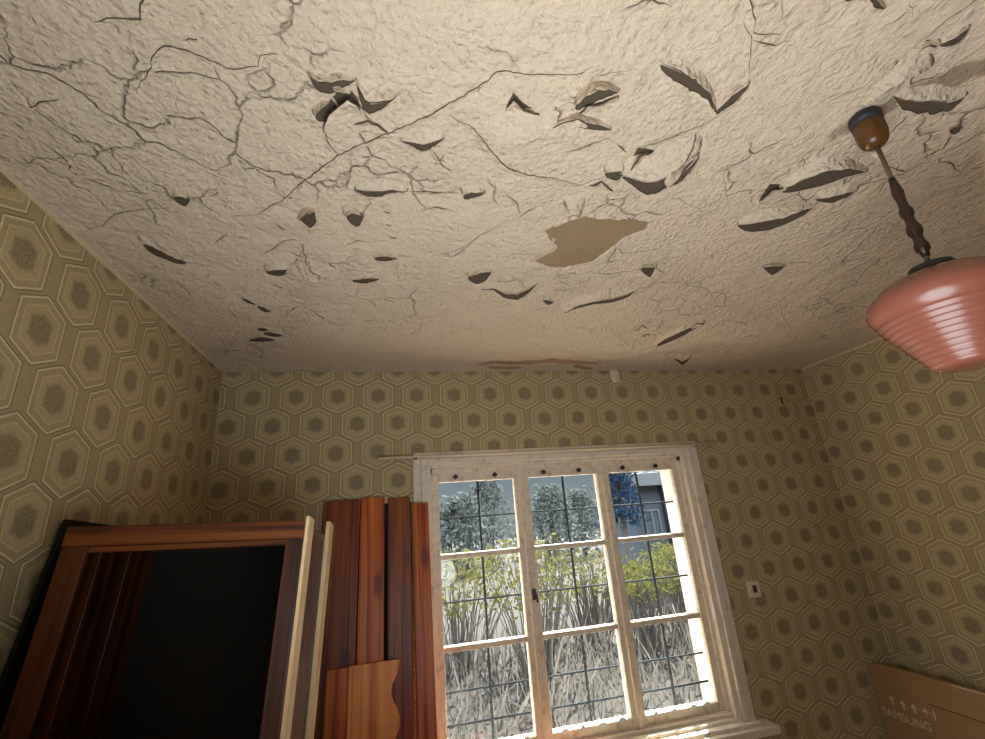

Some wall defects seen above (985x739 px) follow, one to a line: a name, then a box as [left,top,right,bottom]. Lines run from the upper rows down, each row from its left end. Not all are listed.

crack [94,0,153,26]
crack [136,38,279,94]
peeling [306,69,398,145]
crack [215,66,594,258]
peeling [553,81,620,134]
spalling [531,133,702,268]
crack [567,117,715,153]
crack [621,0,671,12]
peeling [656,58,751,117]
crack [742,0,791,82]
peeling [735,156,869,233]
peeling [862,24,971,117]